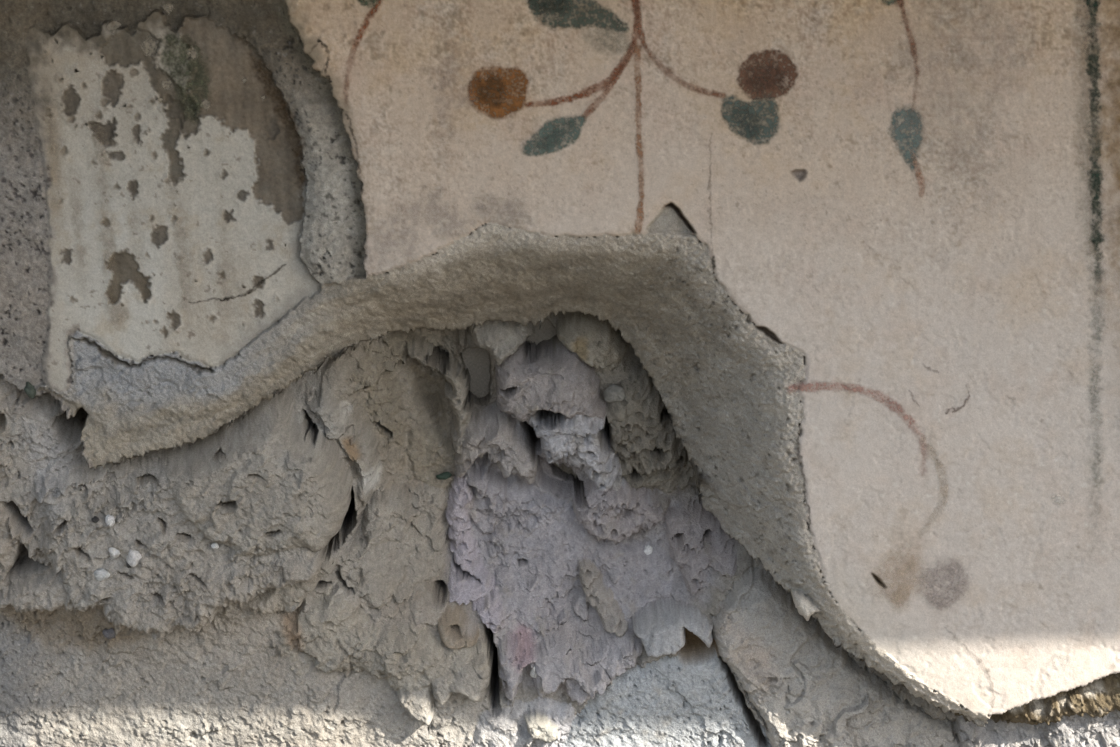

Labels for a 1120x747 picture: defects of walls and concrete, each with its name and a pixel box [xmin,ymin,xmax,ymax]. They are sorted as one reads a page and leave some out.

flaking render [46,17,308,225]
flaking render [60,249,74,266]
flaking render [105,216,178,305]
flaking render [202,249,214,266]
flaking render [252,276,280,320]
flaking render [154,311,181,340]
spalling [52,407,89,445]
spalling [265,311,1120,747]
spalling [0,501,74,613]